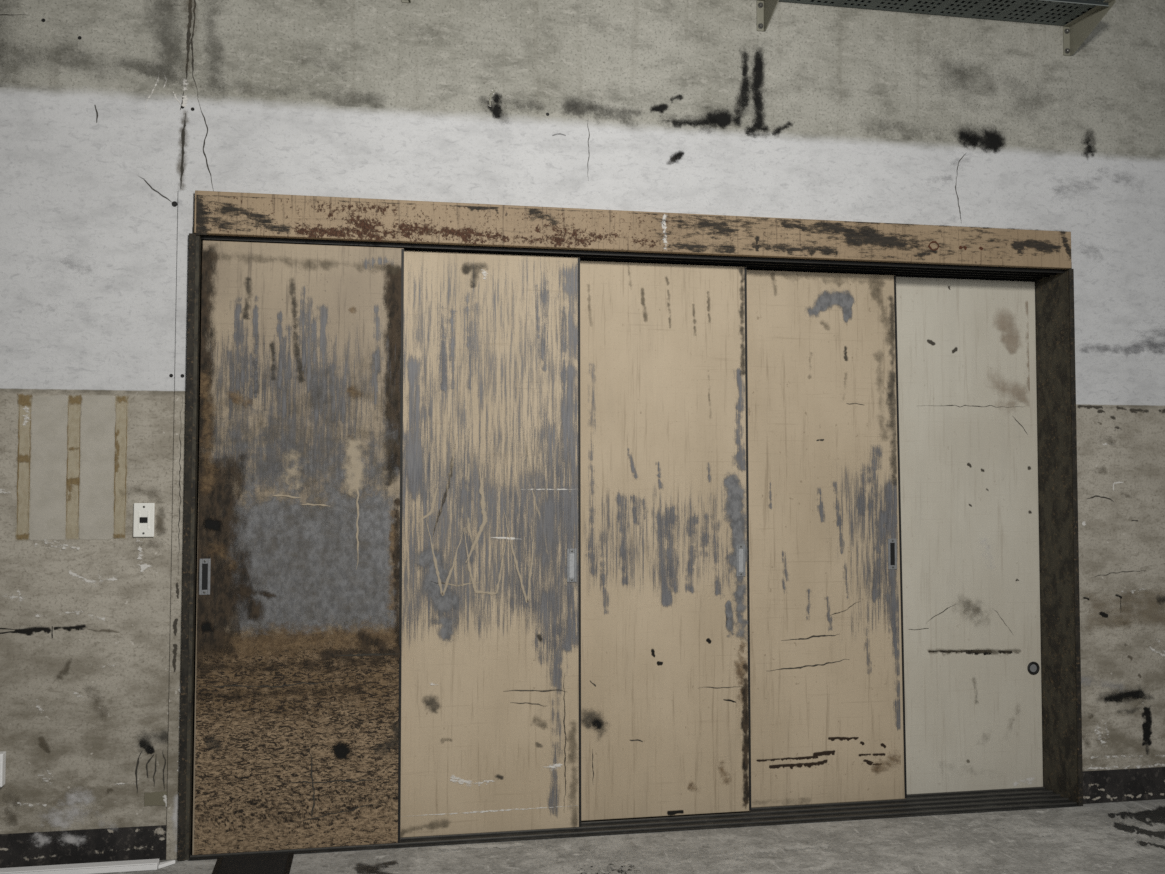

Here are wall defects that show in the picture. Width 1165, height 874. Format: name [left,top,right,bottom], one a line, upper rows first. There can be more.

crack [139,0,214,203]
water stain [733,52,768,135]
rust [194,195,673,855]
rust [701,646,749,806]